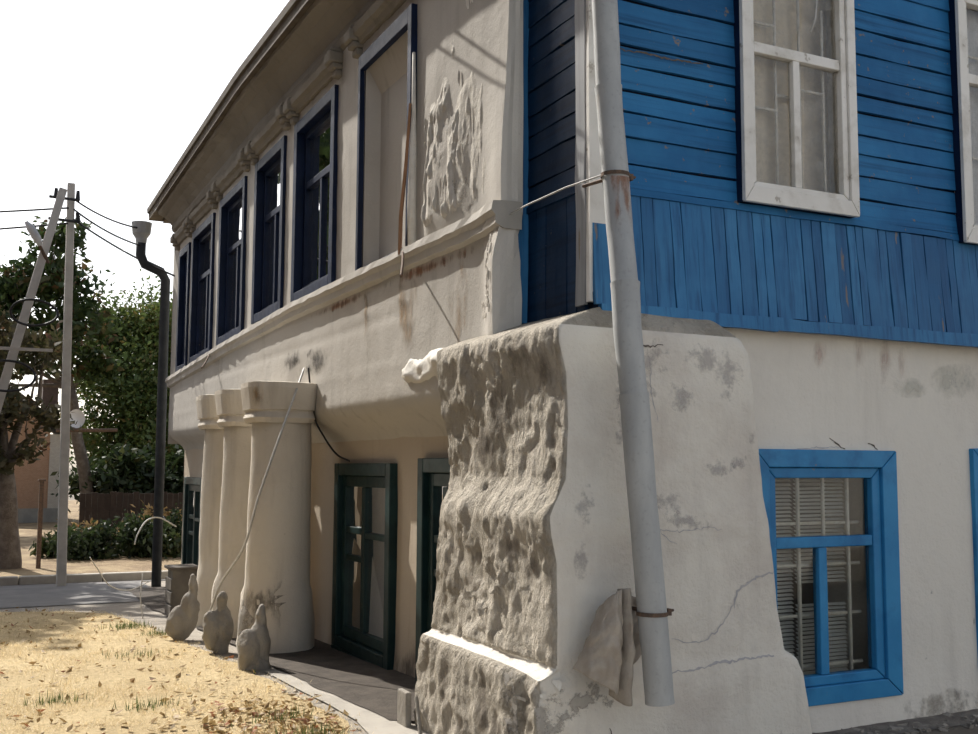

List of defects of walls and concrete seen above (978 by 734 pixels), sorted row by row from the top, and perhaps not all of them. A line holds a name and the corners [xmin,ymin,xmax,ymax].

peeling [421,68,485,228]
crack [672,572,774,674]